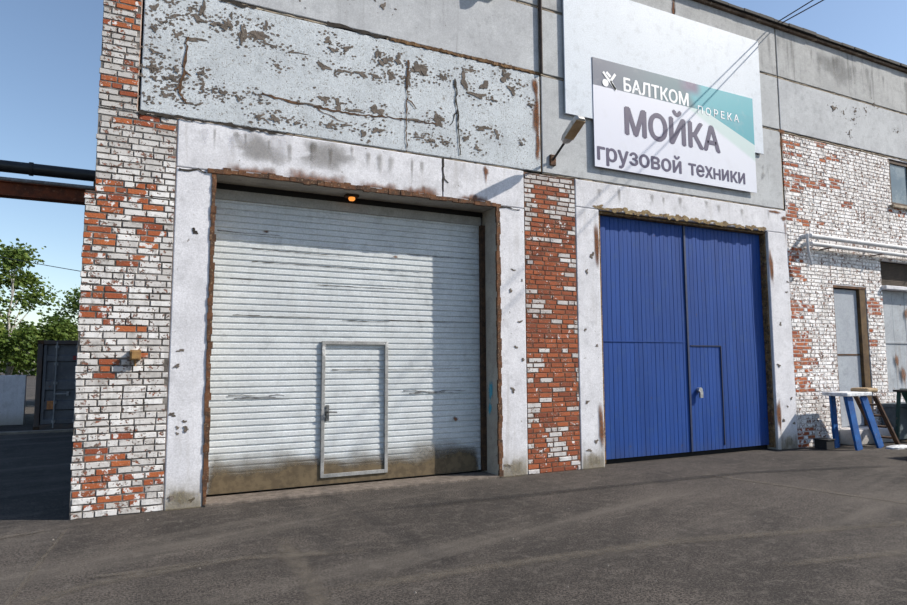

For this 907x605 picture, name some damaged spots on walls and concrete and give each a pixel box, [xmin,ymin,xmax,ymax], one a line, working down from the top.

crack [174,37,191,103]
flaking render [99,0,536,156]
crack [262,60,461,192]
flaking render [782,140,841,193]
flaking render [81,179,166,266]
flaking render [78,286,147,332]
flaking render [511,185,599,473]
flaking render [785,247,814,319]
flaking render [93,359,120,378]
flaking render [787,331,818,408]
flaking render [71,433,164,511]
leakage [209,445,477,495]